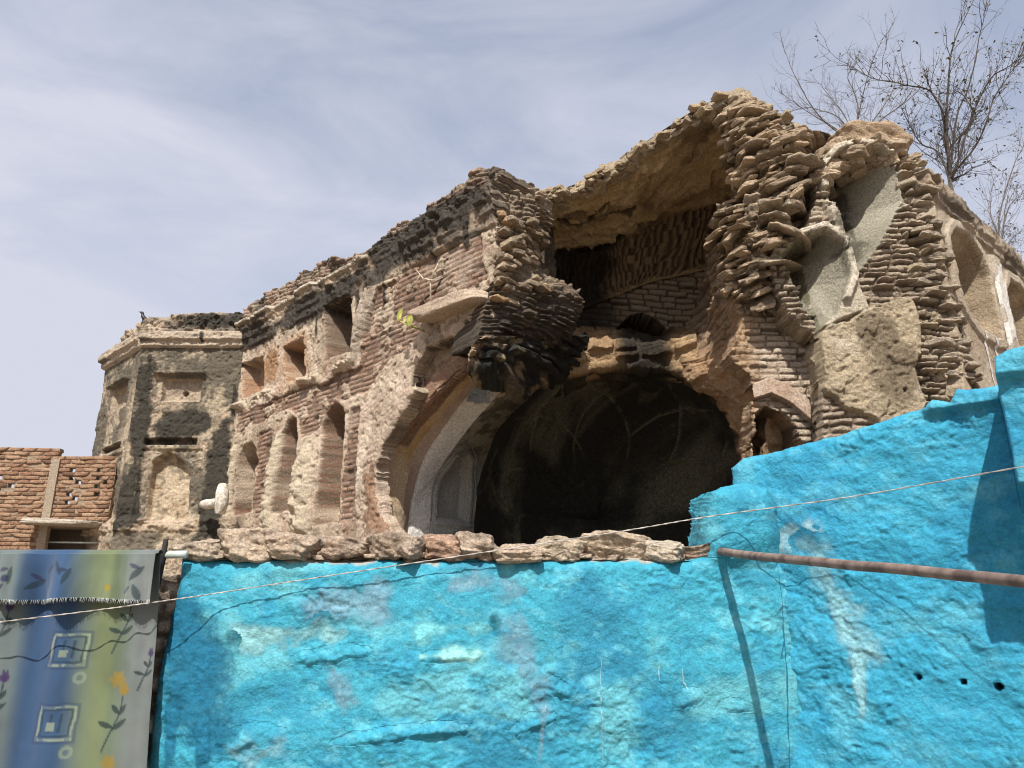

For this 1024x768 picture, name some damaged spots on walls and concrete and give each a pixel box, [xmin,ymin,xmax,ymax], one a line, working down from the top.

spalling [679,249,783,462]
flaking render [821,389,876,438]
flaking render [858,189,1017,407]
peeling [413,622,483,663]
crack [778,571,790,768]
peeling [779,521,883,716]